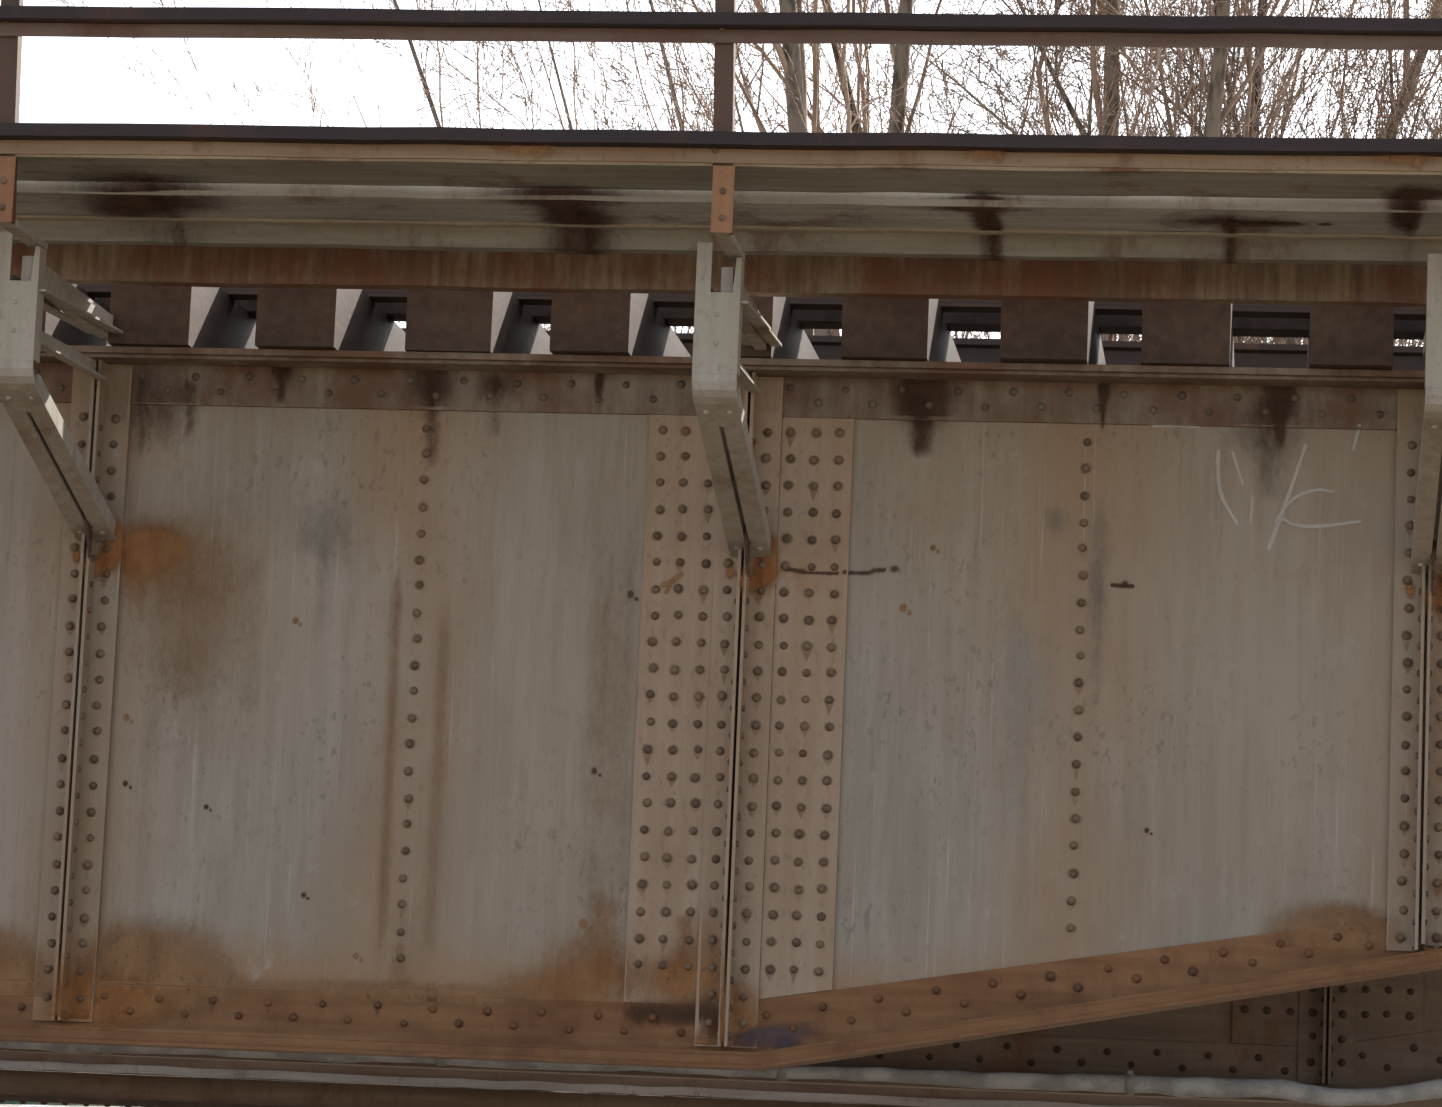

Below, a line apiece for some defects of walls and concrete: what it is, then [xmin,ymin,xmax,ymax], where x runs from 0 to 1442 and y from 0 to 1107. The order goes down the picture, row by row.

corrosion [73,520,126,585]
corrosion [726,537,898,599]
corrosion [639,950,760,1050]